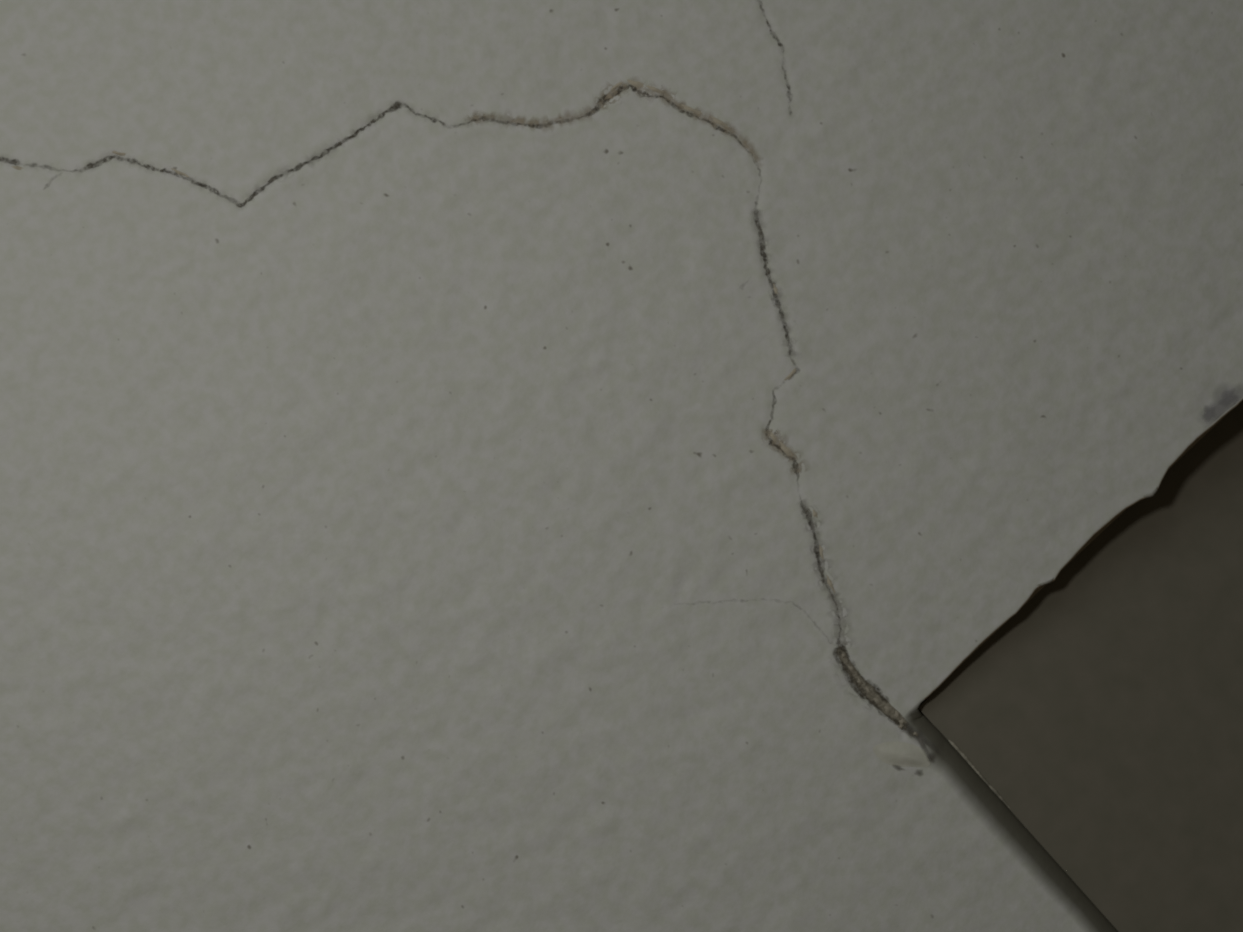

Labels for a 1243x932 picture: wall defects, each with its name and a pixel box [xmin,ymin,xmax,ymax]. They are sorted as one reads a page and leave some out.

crack [87,79,758,207]
crack [755,220,789,338]
crack [766,421,799,474]
crack [803,508,846,645]